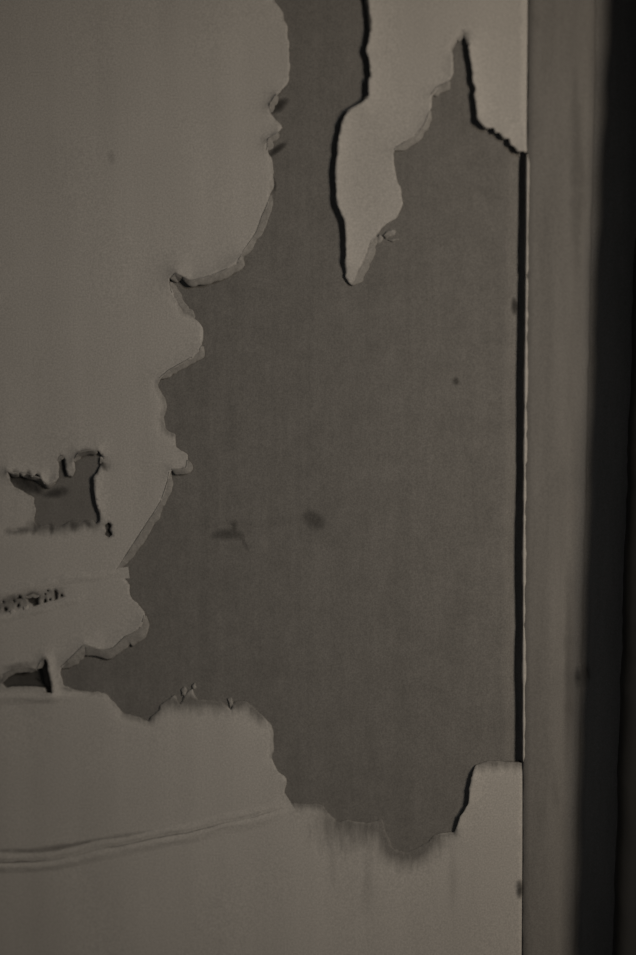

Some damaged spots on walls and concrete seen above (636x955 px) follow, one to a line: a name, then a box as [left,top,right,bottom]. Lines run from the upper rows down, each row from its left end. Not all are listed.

peeling [9,450,112,537]
peeling [61,0,530,852]